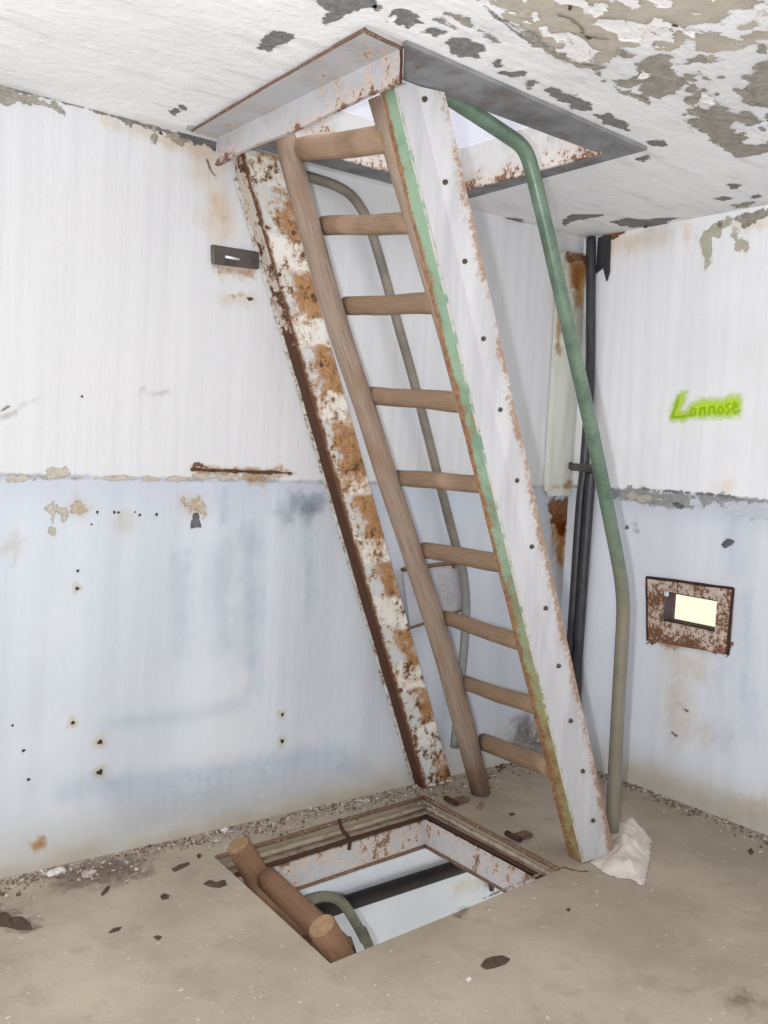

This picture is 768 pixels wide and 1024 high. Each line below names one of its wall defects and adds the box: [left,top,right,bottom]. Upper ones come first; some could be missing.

peeling [317,0,501,59]
rust [190,27,403,132]
peeling [489,0,768,158]
peeling [635,140,667,162]
peeling [562,214,677,228]
peeling [700,184,768,271]
rust [566,251,586,288]
spalling [180,495,207,529]
rust [547,496,568,558]
spalling [611,485,764,509]
rust [645,576,735,657]
rust [295,844,507,893]